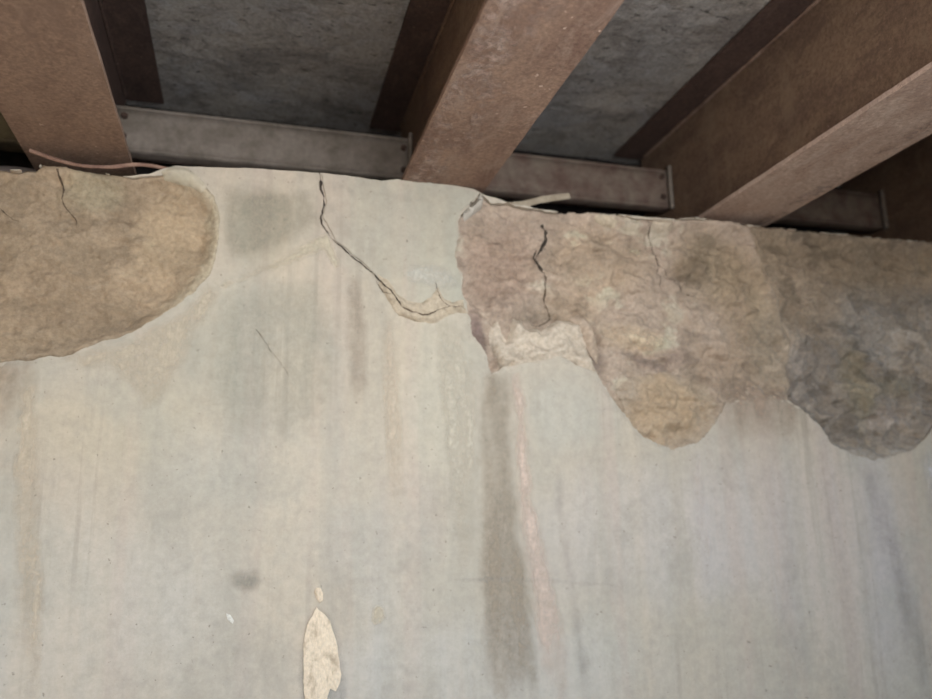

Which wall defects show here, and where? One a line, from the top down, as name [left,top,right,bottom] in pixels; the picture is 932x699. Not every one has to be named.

spalling [0,165,220,363]
crack [318,172,460,315]
crack [532,224,550,327]
spalling [455,196,932,461]
peeling [303,588,342,699]